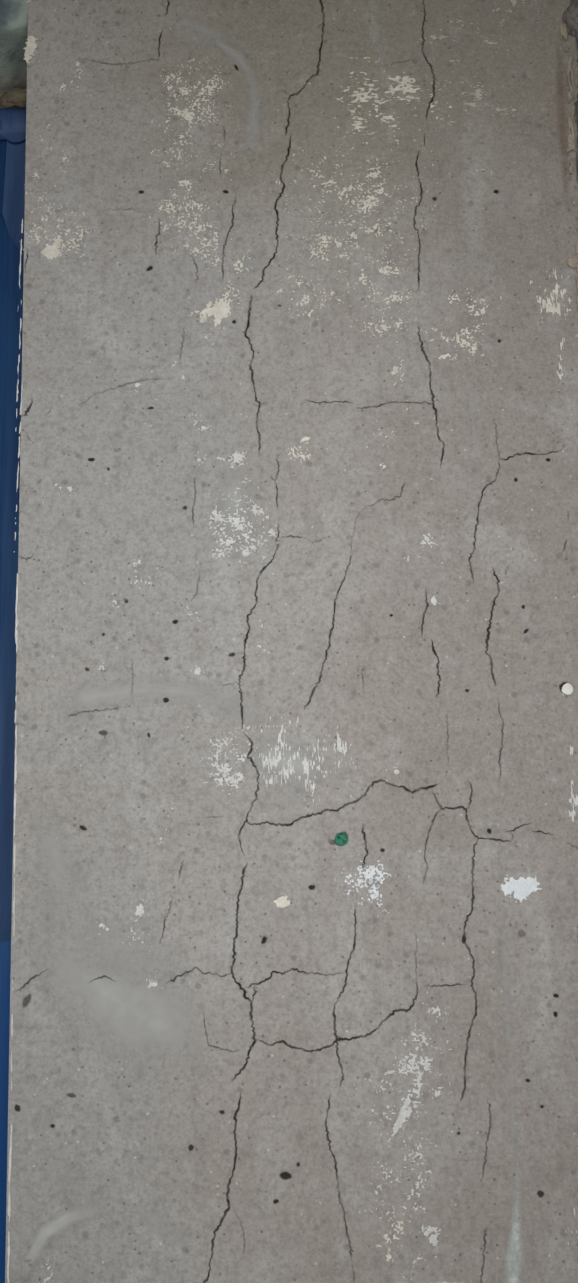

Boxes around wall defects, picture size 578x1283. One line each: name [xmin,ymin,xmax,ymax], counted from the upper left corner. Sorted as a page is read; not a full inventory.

crack [171,0,555,1283]
spalling [530,23,578,326]